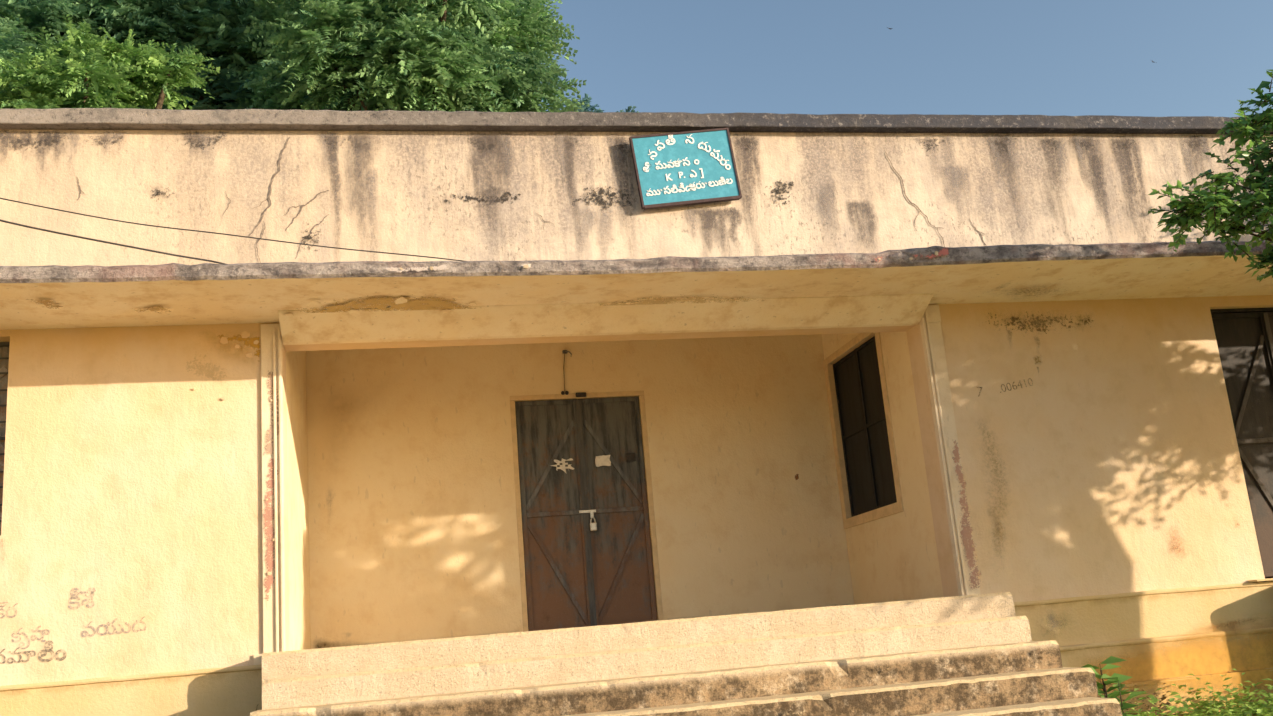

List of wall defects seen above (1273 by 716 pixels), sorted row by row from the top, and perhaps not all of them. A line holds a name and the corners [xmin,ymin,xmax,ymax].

leakage [0,131,123,154]
crack [224,137,329,263]
leakage [321,134,375,220]
leakage [444,135,521,214]
leakage [559,137,633,233]
leakage [686,137,796,246]
leakage [849,202,875,237]
crack [886,153,986,247]
leakage [1042,136,1147,215]
leakage [989,313,1090,332]